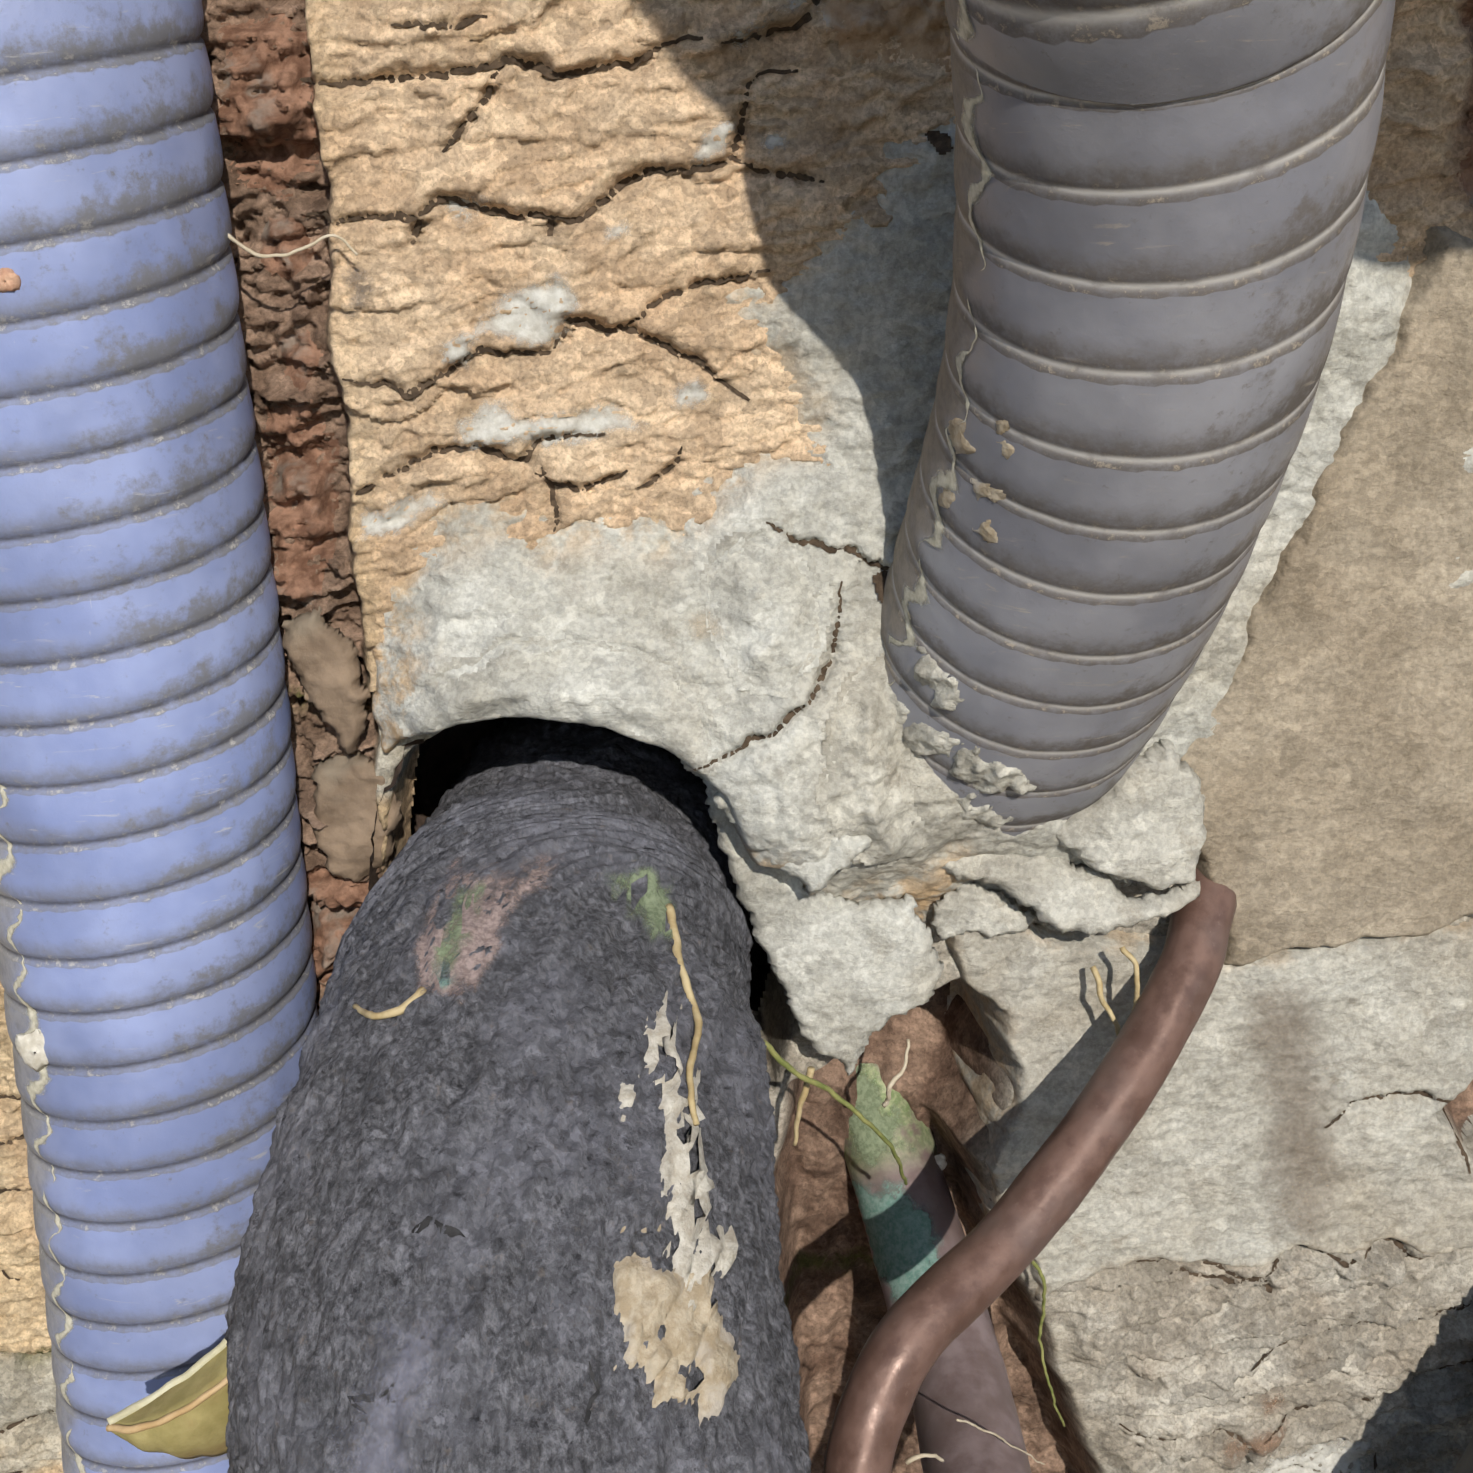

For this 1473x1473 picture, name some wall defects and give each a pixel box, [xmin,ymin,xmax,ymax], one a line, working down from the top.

crack [300,0,825,244]
crack [342,269,770,402]
crack [355,433,683,532]
crack [693,522,889,771]
peeling [703,738,1207,1076]
crack [1324,1091,1471,1174]
crack [1136,1258,1279,1293]
crack [1318,1238,1423,1268]
crack [1418,1300,1472,1320]
crack [1251,1340,1289,1371]
crack [1439,1358,1473,1370]
crack [1119,1405,1309,1453]